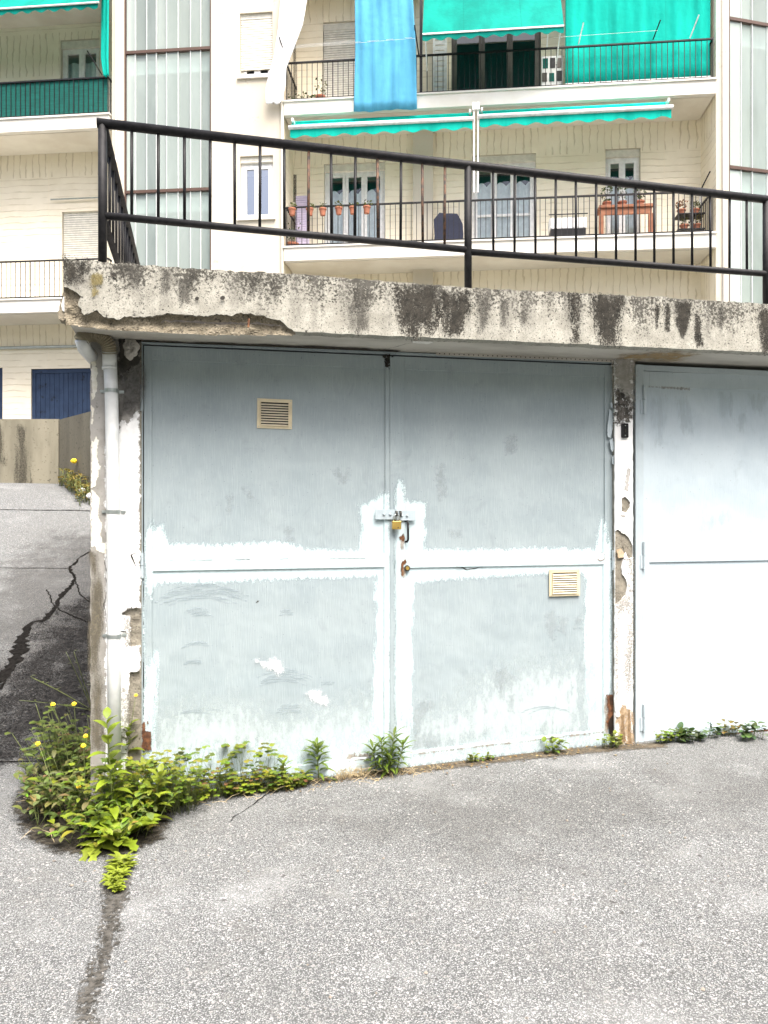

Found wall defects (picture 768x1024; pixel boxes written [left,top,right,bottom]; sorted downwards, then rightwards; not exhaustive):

damp [59,254,89,286]
damp [160,268,200,303]
spalling [61,288,307,336]
damp [246,273,280,302]
damp [348,287,372,336]
damp [391,282,528,341]
damp [568,292,704,399]
damp [759,308,768,356]
peeling [621,497,630,518]
crack [0,549,136,689]
peeling [614,530,635,701]
rust [606,694,634,745]